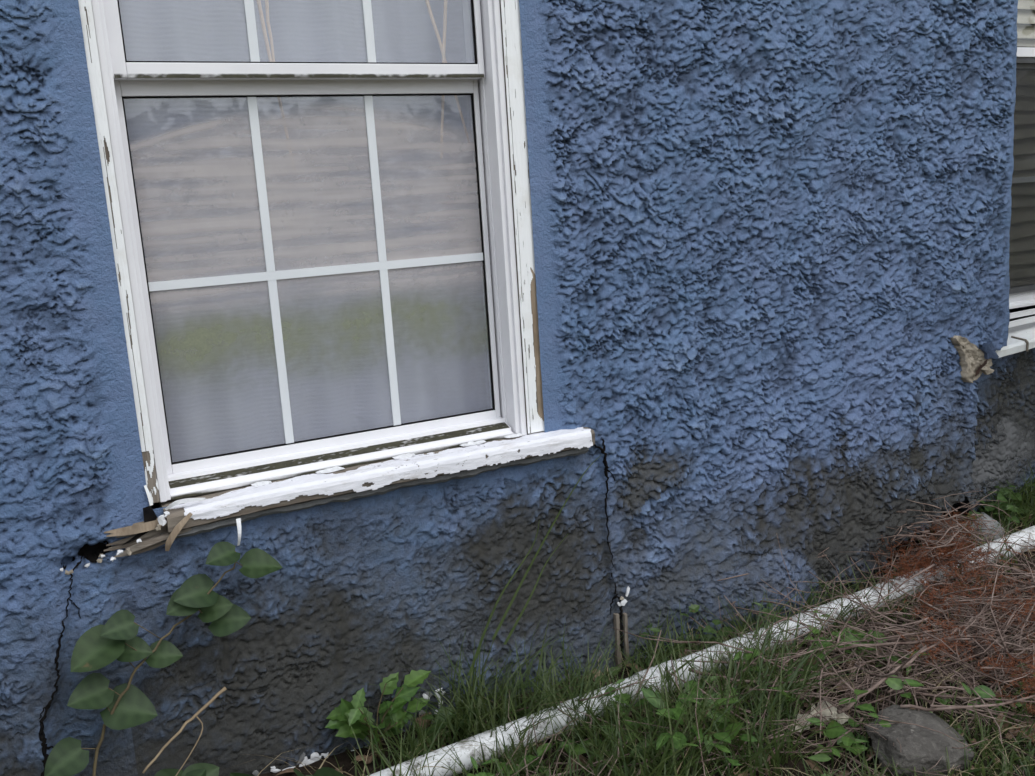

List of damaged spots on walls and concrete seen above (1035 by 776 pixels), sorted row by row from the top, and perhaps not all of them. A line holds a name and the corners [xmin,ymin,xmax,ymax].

peeling [78,0,159,502]
peeling [155,0,593,546]
spalling [951,335,999,383]
crack [39,550,90,776]
leakage [466,483,612,641]
crack [594,439,625,667]
leakage [620,452,684,517]